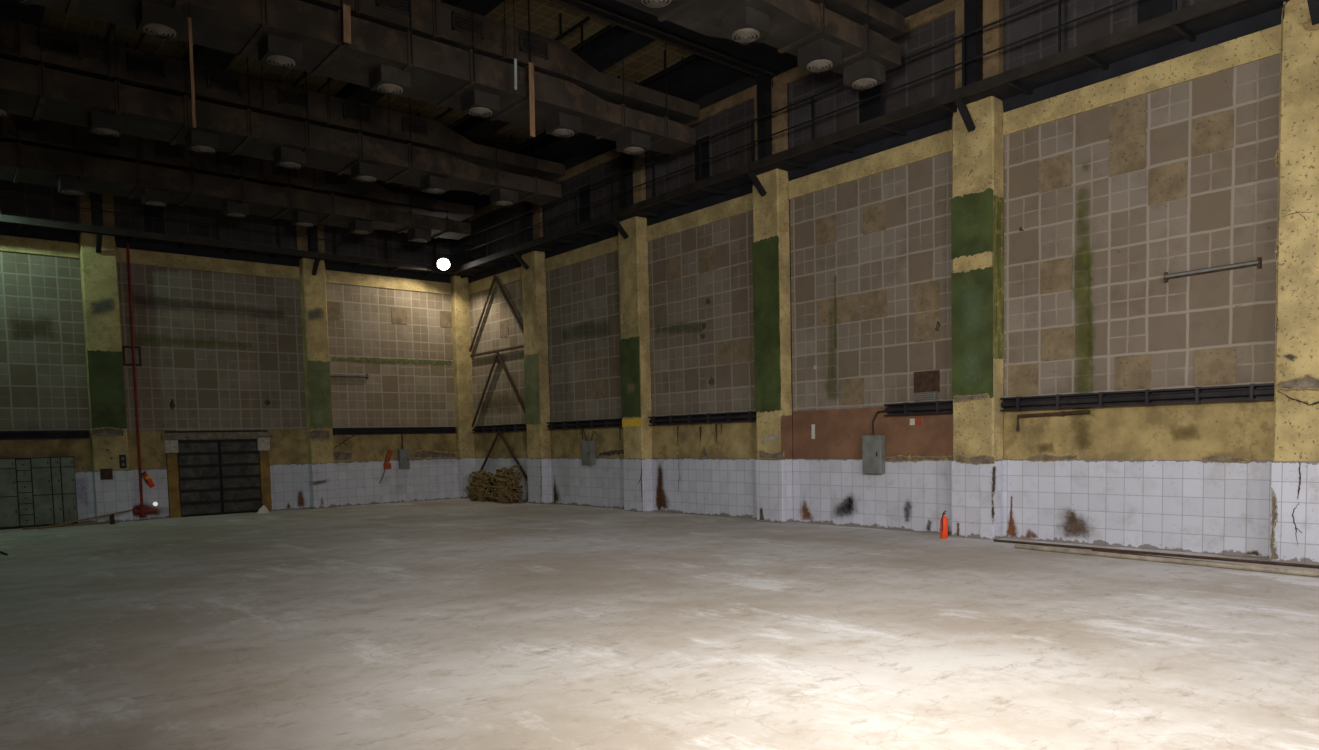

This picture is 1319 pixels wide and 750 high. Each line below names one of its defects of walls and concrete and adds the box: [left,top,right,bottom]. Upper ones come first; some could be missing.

spalling [1275,374,1319,391]
rust [656,469,667,510]
rust [1007,496,1037,538]
crack [1292,461,1302,546]